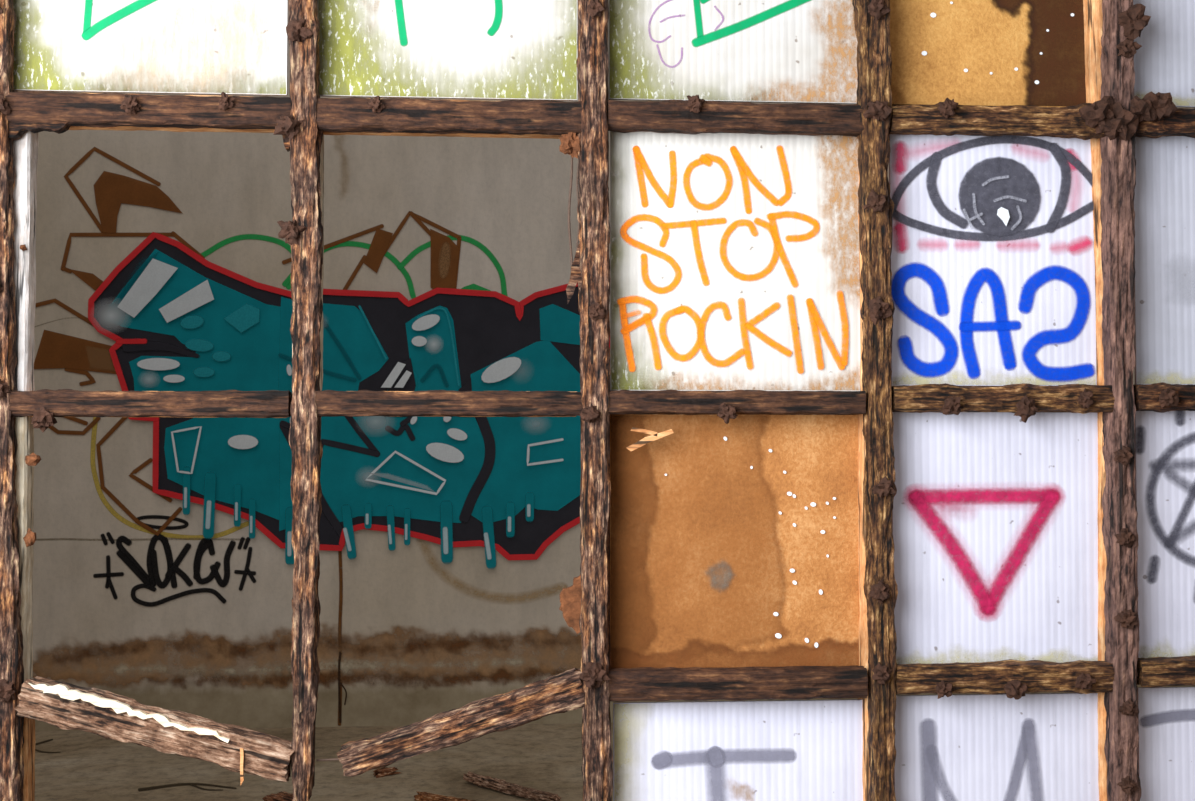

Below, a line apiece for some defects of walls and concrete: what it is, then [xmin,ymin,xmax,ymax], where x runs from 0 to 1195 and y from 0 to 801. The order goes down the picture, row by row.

water stain [32,631,293,688]
water stain [317,626,582,686]